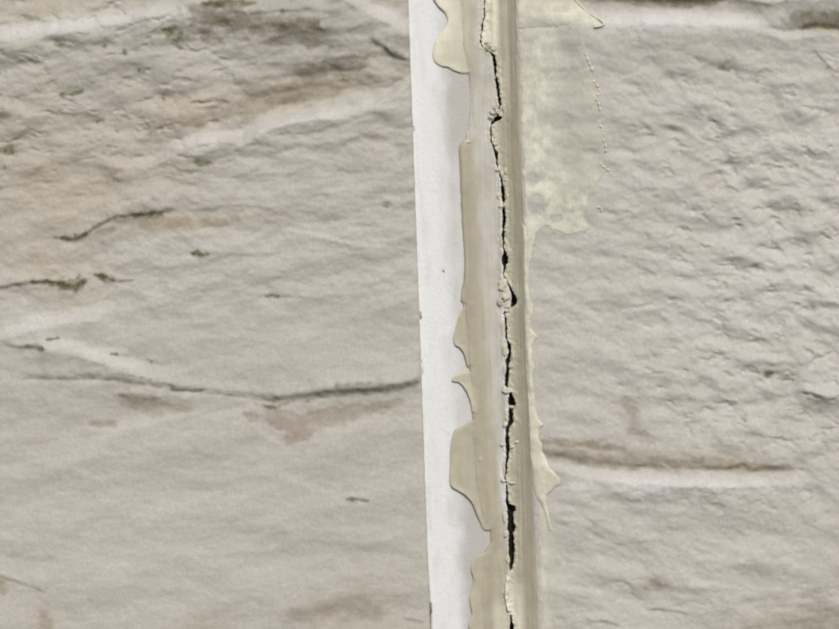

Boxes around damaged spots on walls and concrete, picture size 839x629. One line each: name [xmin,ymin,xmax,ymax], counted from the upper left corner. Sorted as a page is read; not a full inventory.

crack [480,0,519,570]